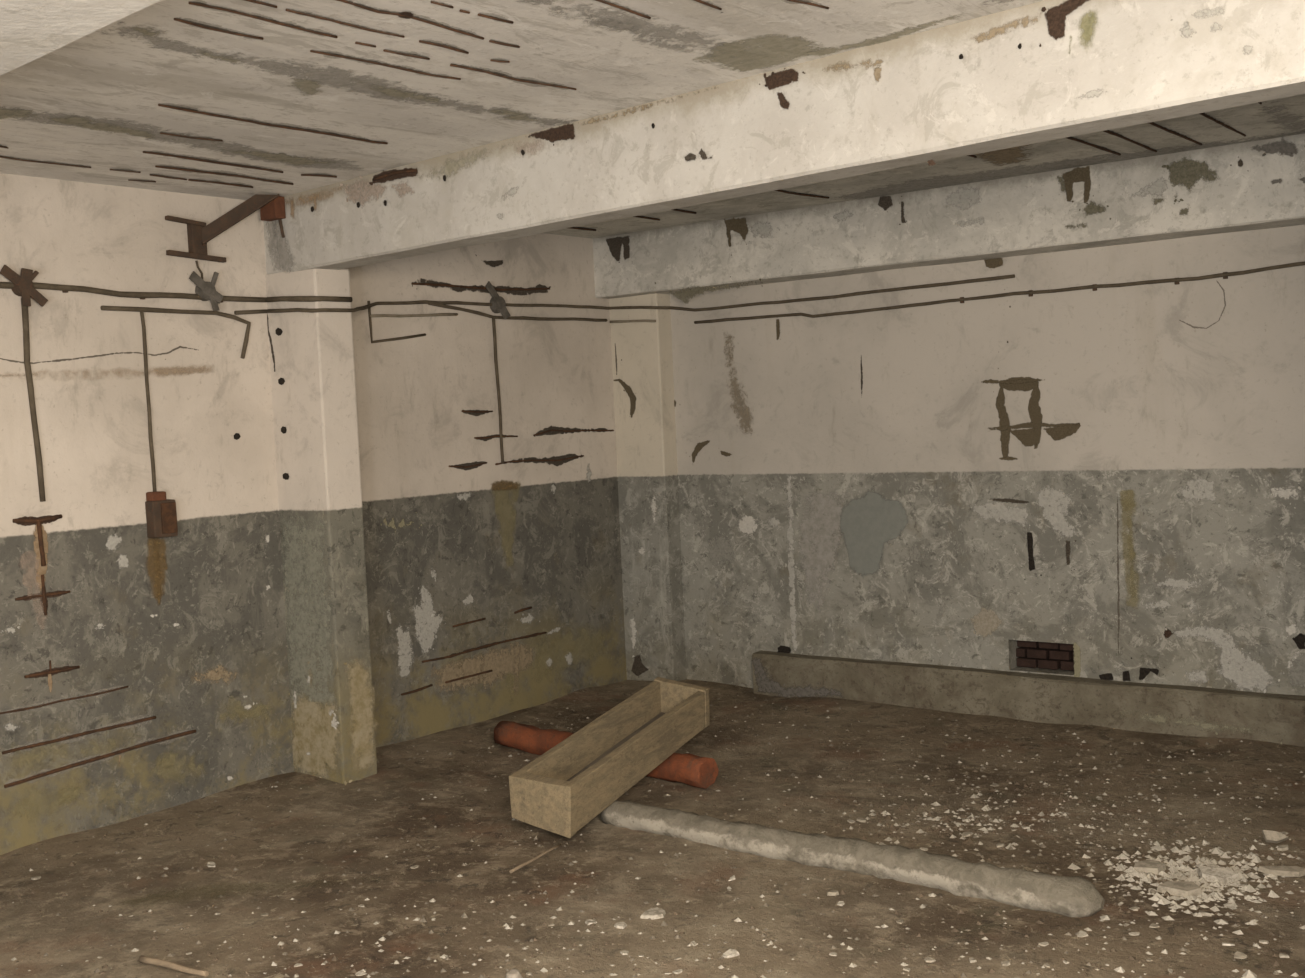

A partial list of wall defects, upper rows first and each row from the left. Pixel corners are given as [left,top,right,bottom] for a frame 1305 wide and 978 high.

spalling [174,0,576,90]
spalling [1039,0,1089,47]
spalling [759,68,805,109]
leakage [0,107,360,170]
peeling [110,151,418,206]
spalling [158,104,388,144]
spalling [528,124,587,146]
peeling [1066,122,1243,215]
spalling [983,368,1081,460]
corrosion [147,538,167,604]
peeling [387,568,565,696]
corrosion [432,642,534,694]